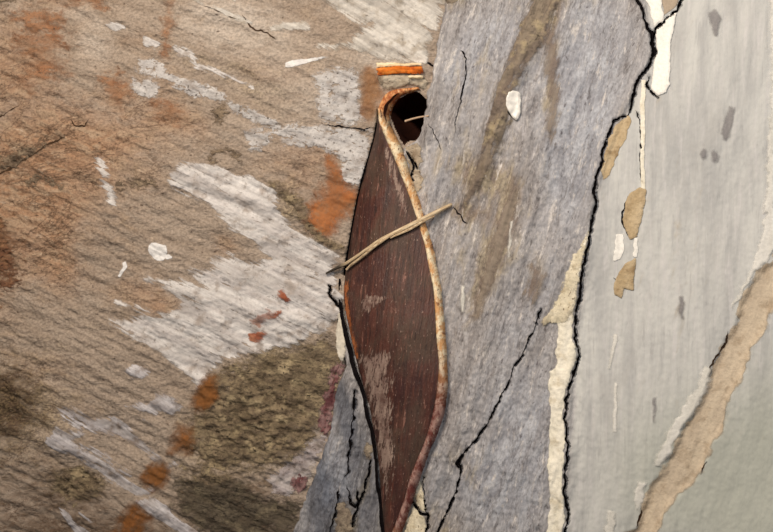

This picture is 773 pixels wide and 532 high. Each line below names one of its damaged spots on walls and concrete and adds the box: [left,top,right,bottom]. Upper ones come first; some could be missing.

corrosion [193,376,218,411]
corrosion [248,321,265,343]
corrosion [268,290,290,319]
corrosion [306,156,358,235]
crack [327,121,385,532]
corrosion [362,62,423,116]
crack [412,309,541,532]
peeling [541,232,589,532]
crack [562,0,682,532]
peeling [601,0,678,298]
spalling [628,72,773,532]
crack [706,333,728,385]